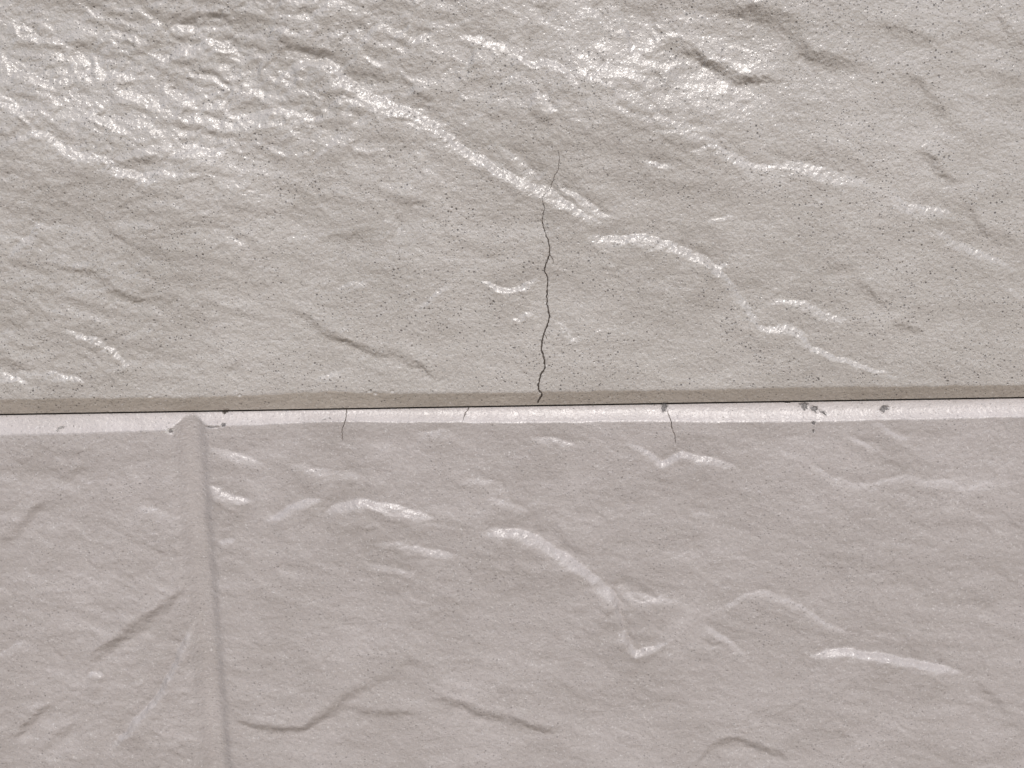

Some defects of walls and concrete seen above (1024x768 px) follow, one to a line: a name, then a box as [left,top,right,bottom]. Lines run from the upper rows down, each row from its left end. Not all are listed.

crack [537,152,560,403]